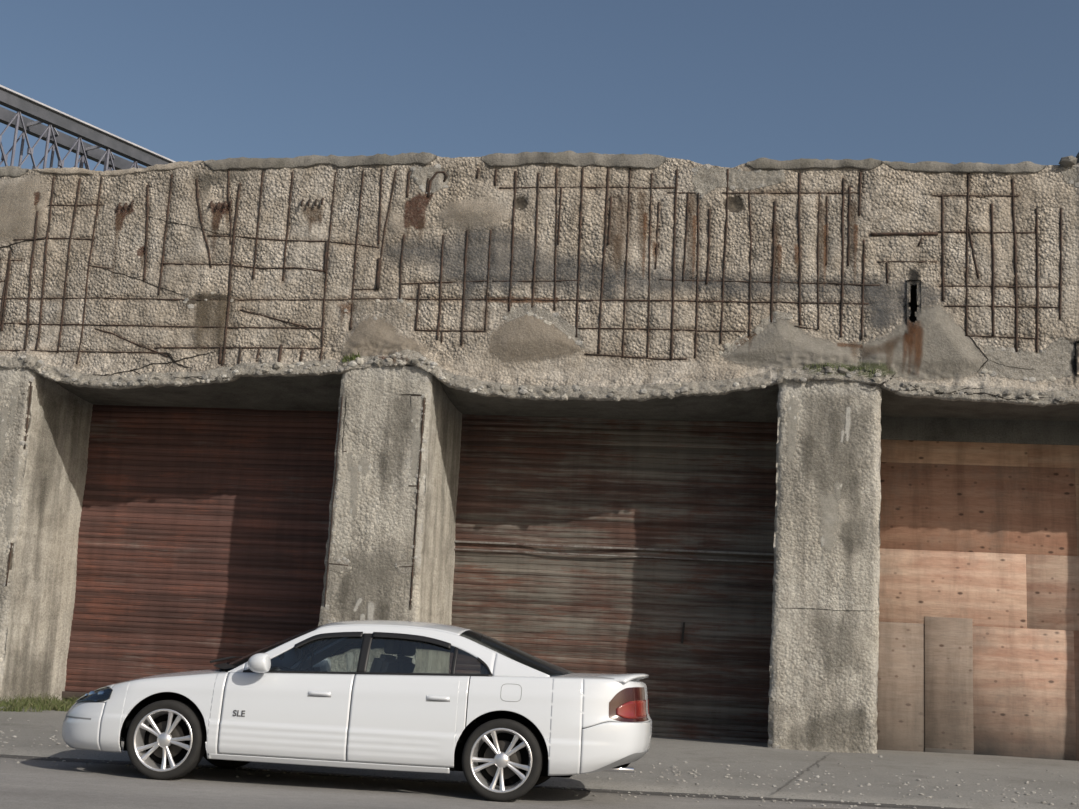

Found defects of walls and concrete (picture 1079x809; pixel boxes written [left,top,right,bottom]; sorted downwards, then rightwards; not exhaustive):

rust [115,204,134,230]
rust [211,203,229,229]
rust [405,193,432,229]
crack [84,351,230,382]
damp [1070,340,1079,380]
spalling [0,164,1079,626]